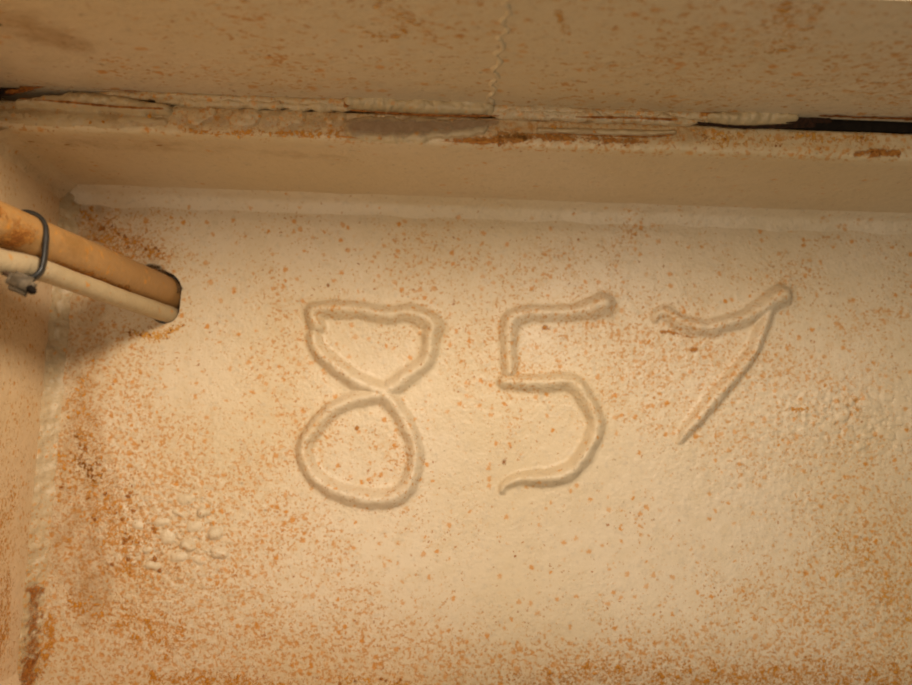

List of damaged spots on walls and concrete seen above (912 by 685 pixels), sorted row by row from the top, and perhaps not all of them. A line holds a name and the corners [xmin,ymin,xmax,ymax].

peeling [0,86,173,129]
peeling [342,97,499,145]
corrosion [688,129,901,157]
crack [773,115,912,134]
corrosion [19,373,188,685]
corrosion [507,524,912,685]
corrosion [148,668,286,685]